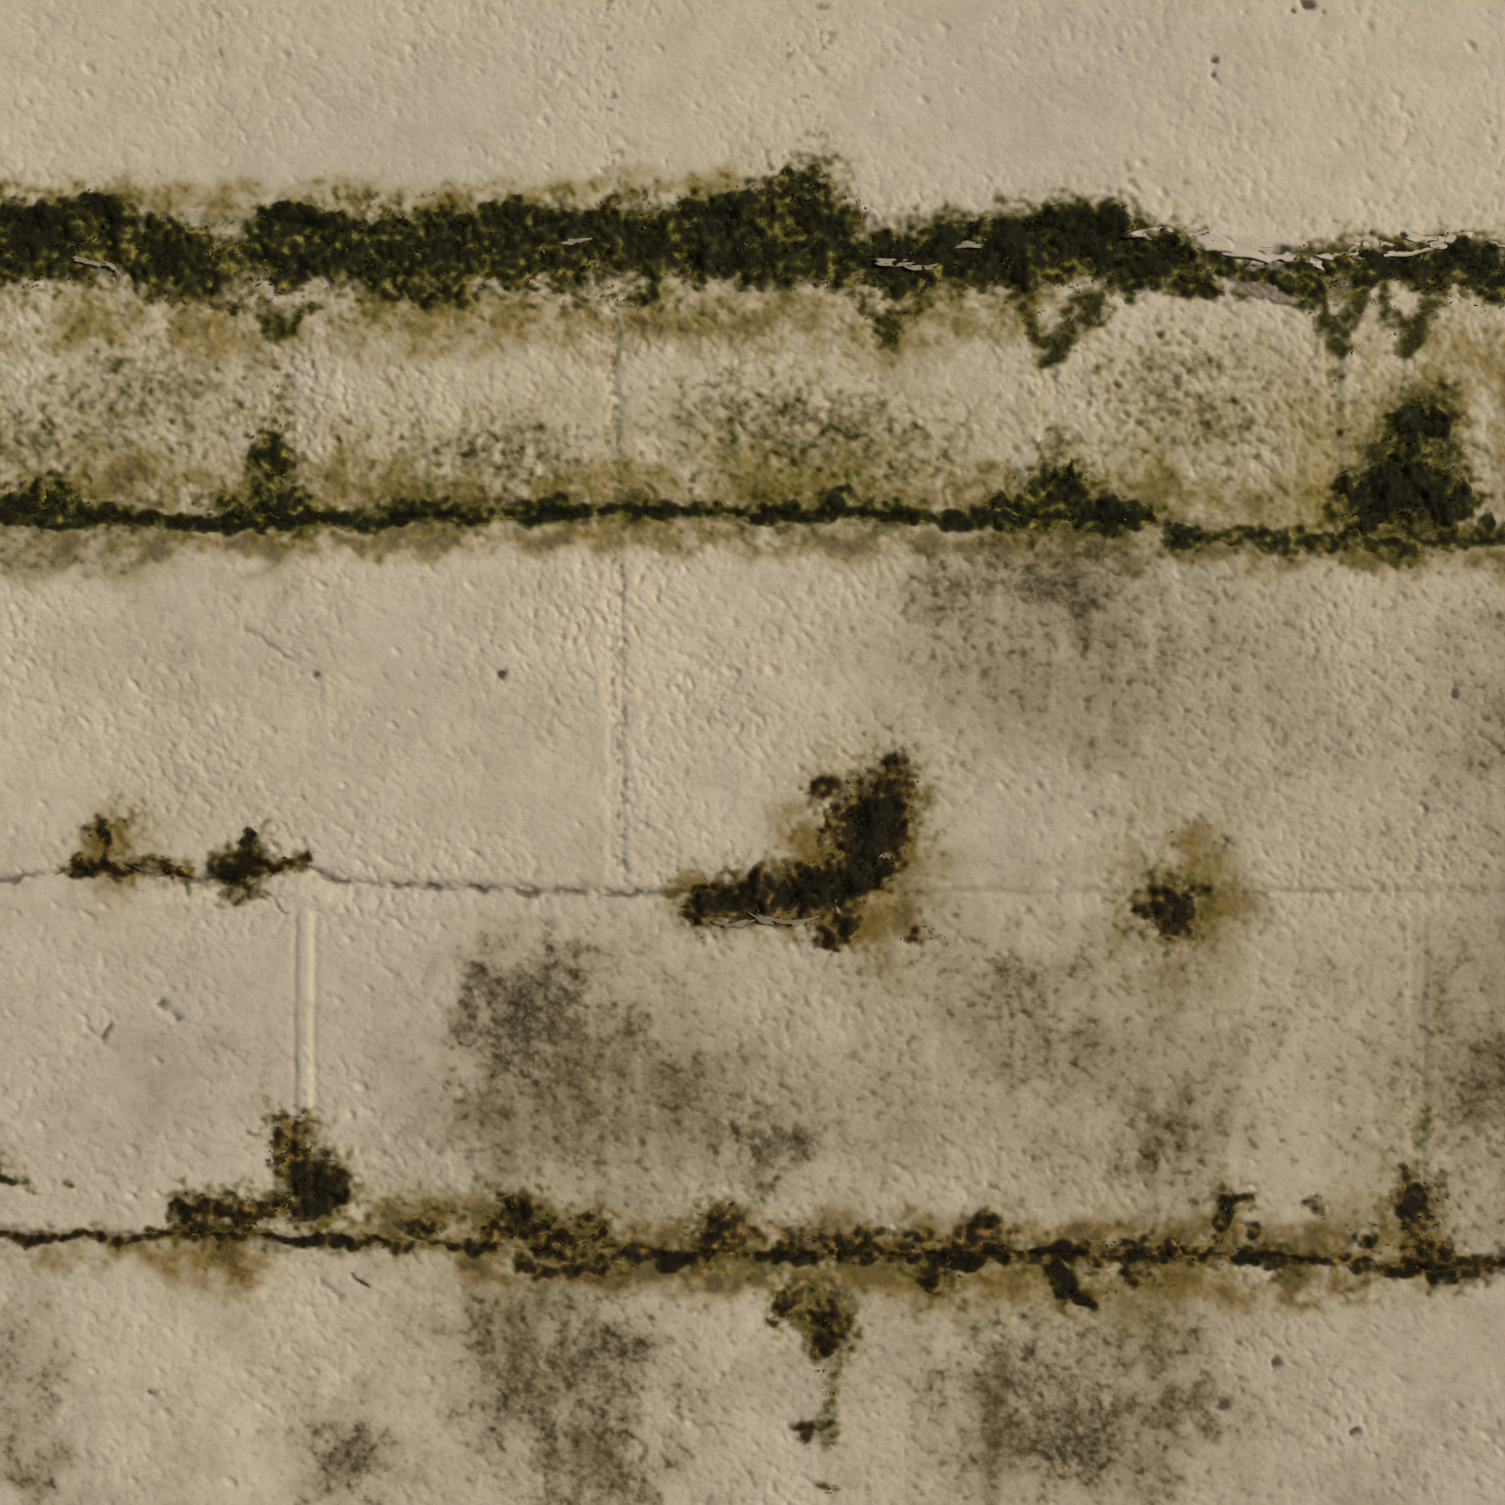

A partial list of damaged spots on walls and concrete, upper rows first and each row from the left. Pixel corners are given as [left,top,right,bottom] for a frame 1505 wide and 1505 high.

leakage [553,179,602,198]
leakage [326,291,830,356]
leakage [888,296,1046,367]
peeling [1123,222,1505,306]
leakage [0,294,250,510]
leakage [1,530,88,568]
leakage [106,373,1021,574]
leakage [901,357,1423,675]
leakage [449,924,651,1166]
leakage [657,1053,818,1200]
leakage [1109,1074,1203,1207]
leakage [1428,1030,1505,1158]